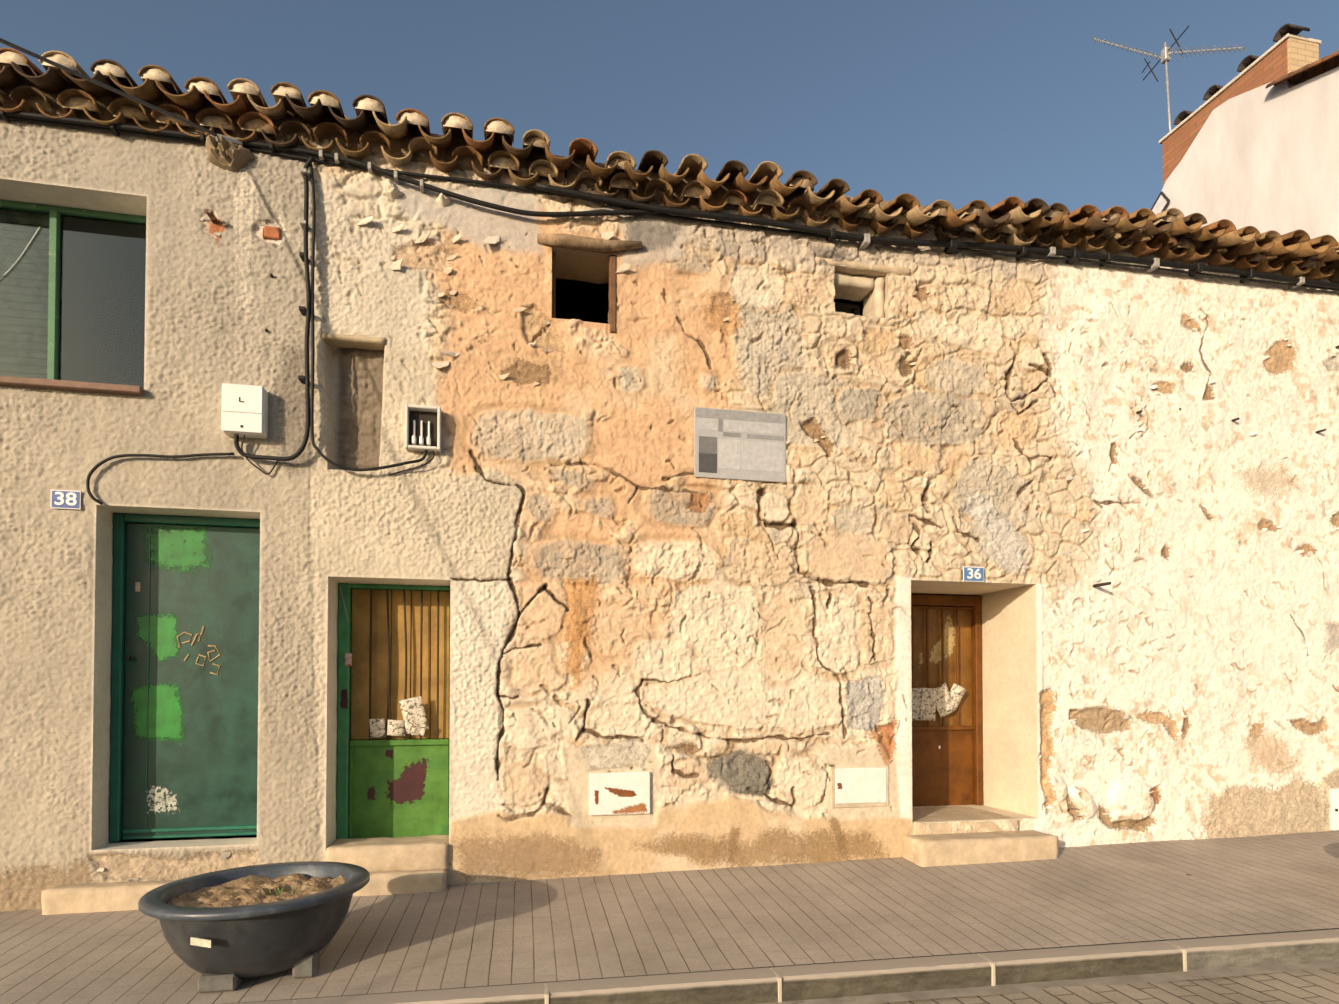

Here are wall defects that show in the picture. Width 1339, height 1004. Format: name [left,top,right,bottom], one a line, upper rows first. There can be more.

spalling [499,304,565,386]
spalling [836,347,855,369]
spalling [800,417,834,457]
crack [1004,354,1056,496]
crack [554,462,698,503]
crack [450,450,569,781]
crack [576,488,876,807]
spalling [1040,685,1191,832]
crack [501,788,572,821]
peeling [1201,770,1339,839]
damp [458,835,597,880]
damp [644,818,883,867]